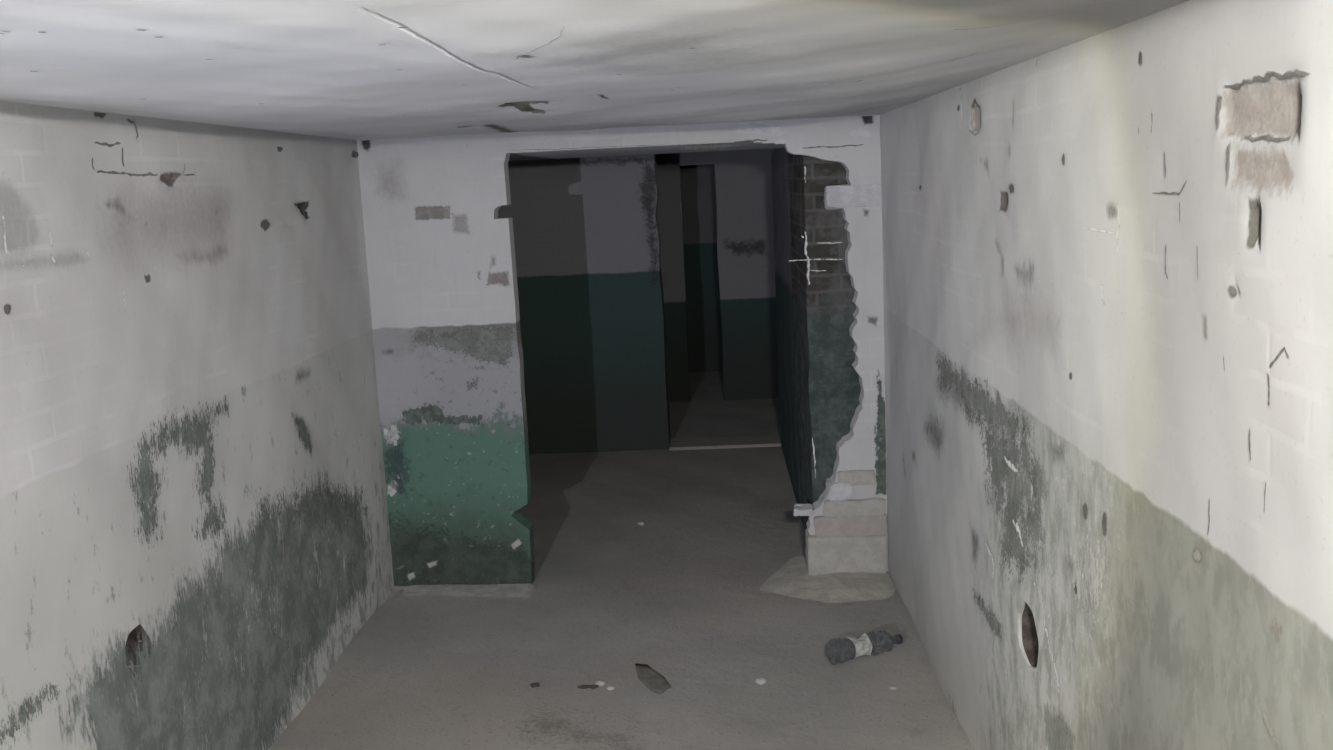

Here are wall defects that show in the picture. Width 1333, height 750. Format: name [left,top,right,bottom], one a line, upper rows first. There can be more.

spalling [498,101,548,114]
flaking render [1216,70,1309,130]
flaking render [1245,134,1290,143]
spalling [824,183,882,210]
spalling [1248,199,1260,247]
peeling [937,351,1047,583]
peeling [972,589,1001,639]
spalling [1022,603,1039,667]